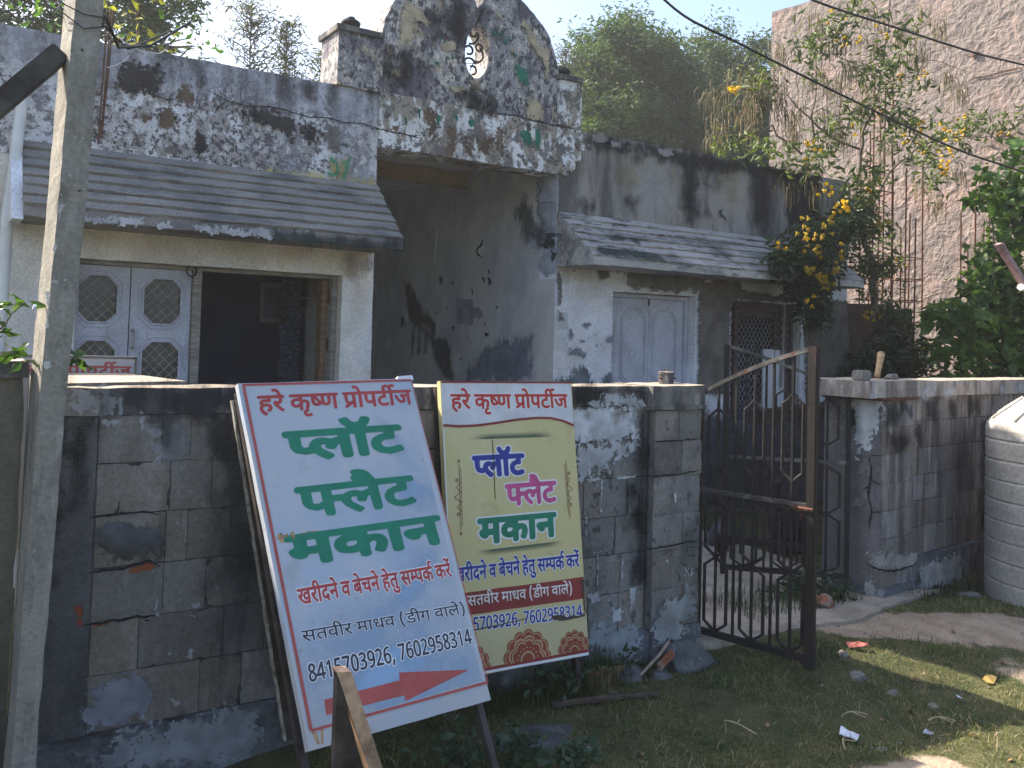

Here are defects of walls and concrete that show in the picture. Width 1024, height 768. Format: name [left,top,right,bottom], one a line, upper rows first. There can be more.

peeling [112,59,205,128]
peeling [241,104,354,154]
damp [585,136,823,226]
damp [401,282,453,380]
damp [467,335,533,382]
crack [90,501,160,518]
peeling [573,406,641,484]
crack [864,454,881,528]
damp [887,382,987,526]
crack [89,560,160,574]
crack [84,615,157,626]
peeling [76,670,271,768]